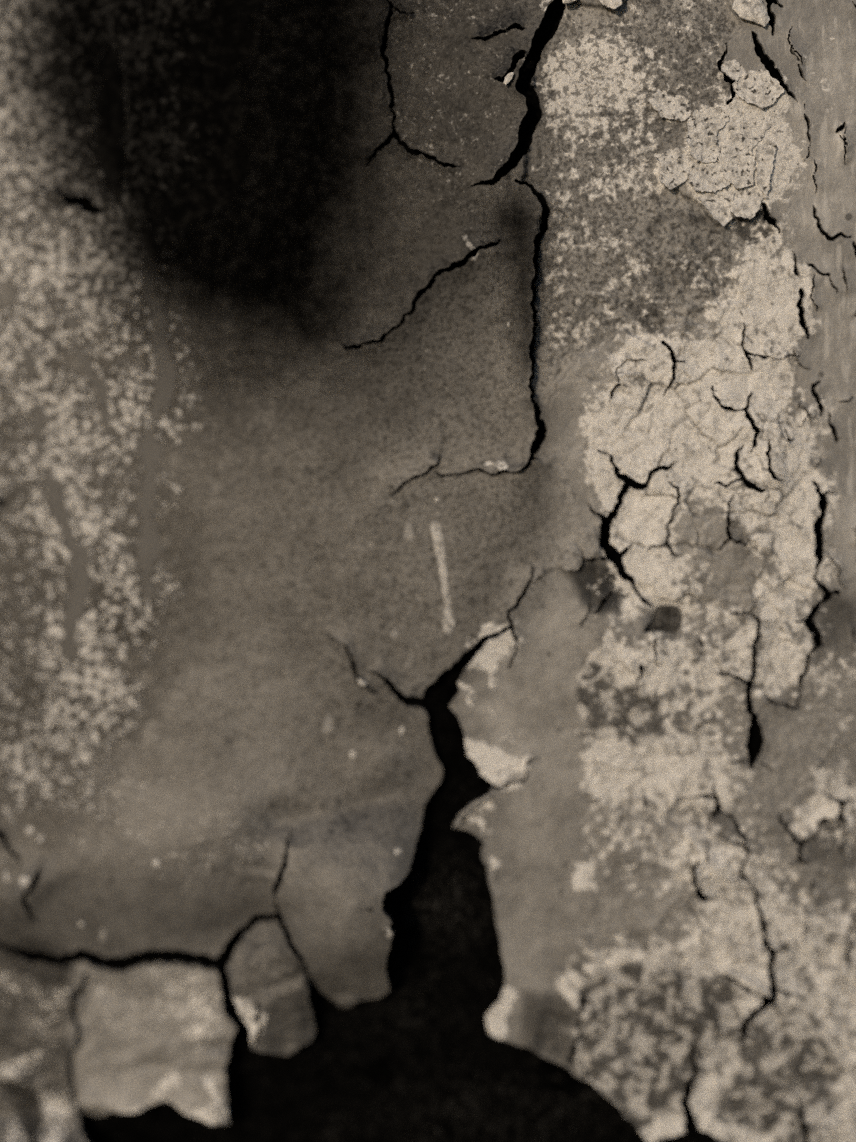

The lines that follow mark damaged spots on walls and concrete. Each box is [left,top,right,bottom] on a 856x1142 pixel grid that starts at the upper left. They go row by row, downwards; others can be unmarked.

water stain [22,346,93,665]
water stain [61,302,111,438]
crack [329,562,543,711]
crack [367,0,566,495]
crack [580,449,681,625]
crack [607,341,685,403]
peeling [523,0,784,407]
crack [698,0,856,769]
crack [2,827,294,1107]
peeling [63,686,725,1142]
peeling [724,969,771,997]
crack [678,783,856,1046]